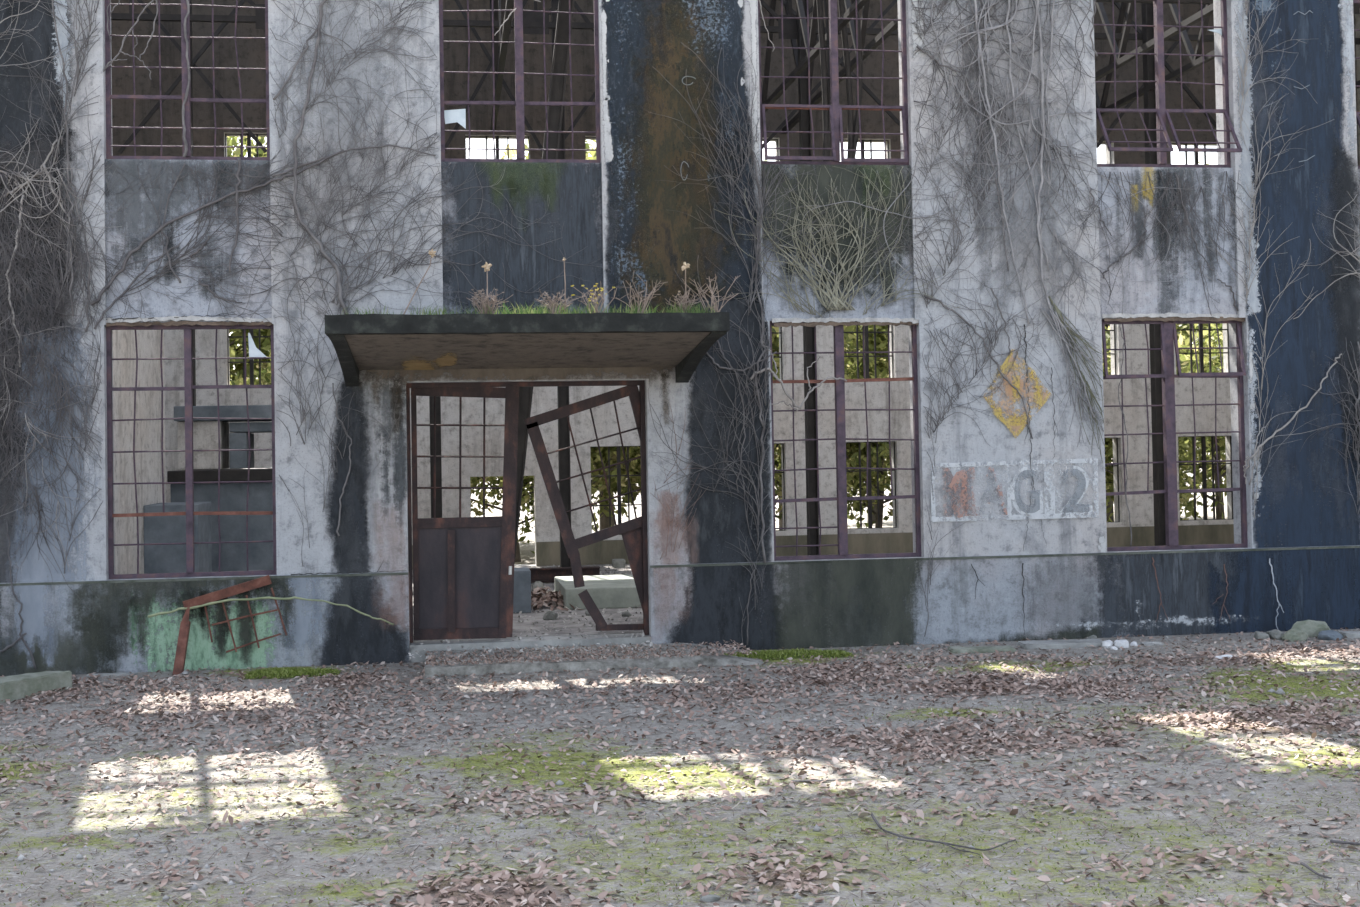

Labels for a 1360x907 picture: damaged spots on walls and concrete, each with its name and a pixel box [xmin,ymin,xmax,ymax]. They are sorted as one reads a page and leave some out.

leakage [1056,0,1360,638]
leakage [121,592,266,672]
leakage [282,380,410,666]